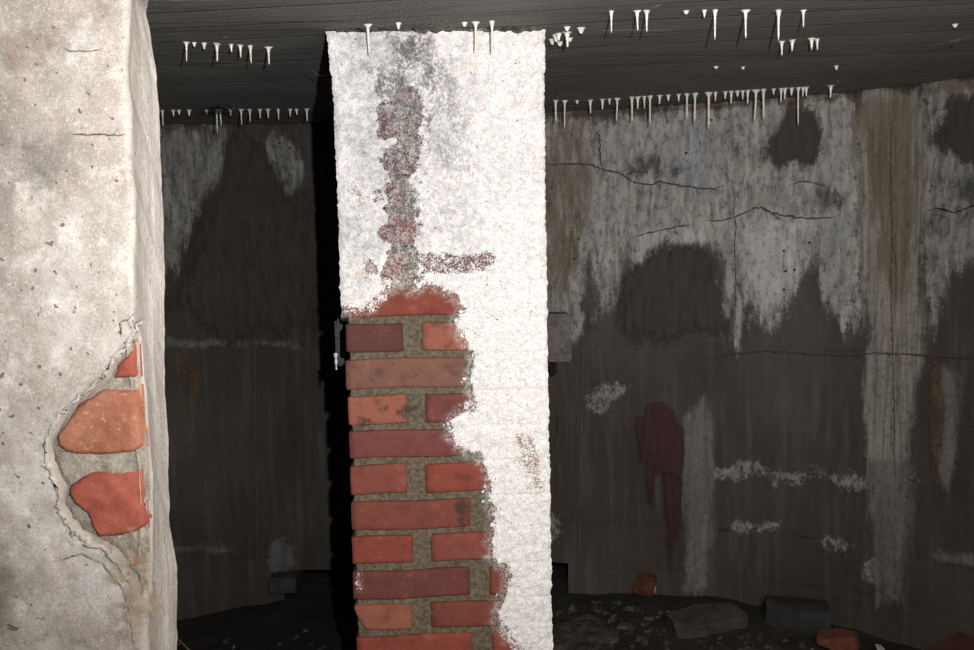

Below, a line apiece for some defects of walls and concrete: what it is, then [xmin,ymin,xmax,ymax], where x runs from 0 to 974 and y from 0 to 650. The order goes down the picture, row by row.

leakage [335,26,543,57]
flaking render [42,318,152,587]
leakage [160,121,326,348]
peeling [325,29,554,650]
crack [549,130,836,319]
leakage [545,79,974,608]
crack [699,106,974,481]